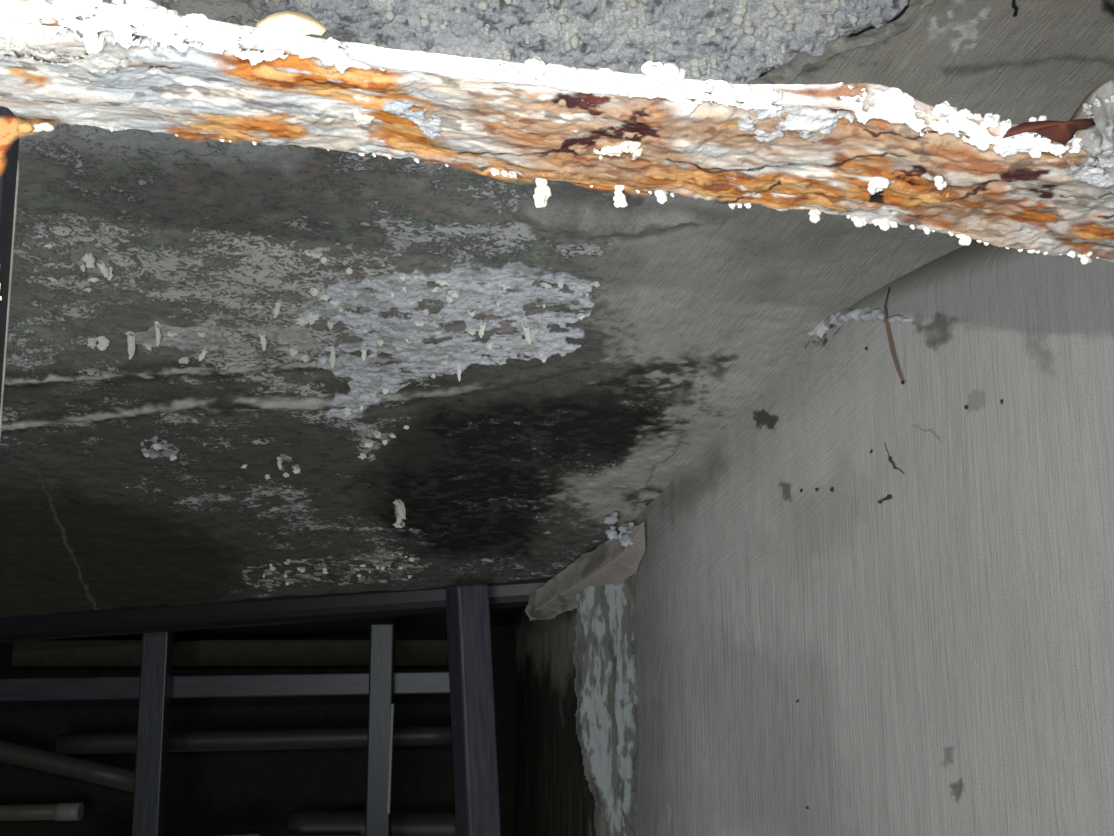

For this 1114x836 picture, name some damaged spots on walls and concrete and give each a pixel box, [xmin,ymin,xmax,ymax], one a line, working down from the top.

rust [255,10,327,37]
rust [10,68,46,83]
rust [0,117,55,174]
rust [170,114,307,143]
rust [220,50,1060,226]
rust [1002,118,1096,169]
rust [1063,221,1114,256]
damp [393,358,700,554]